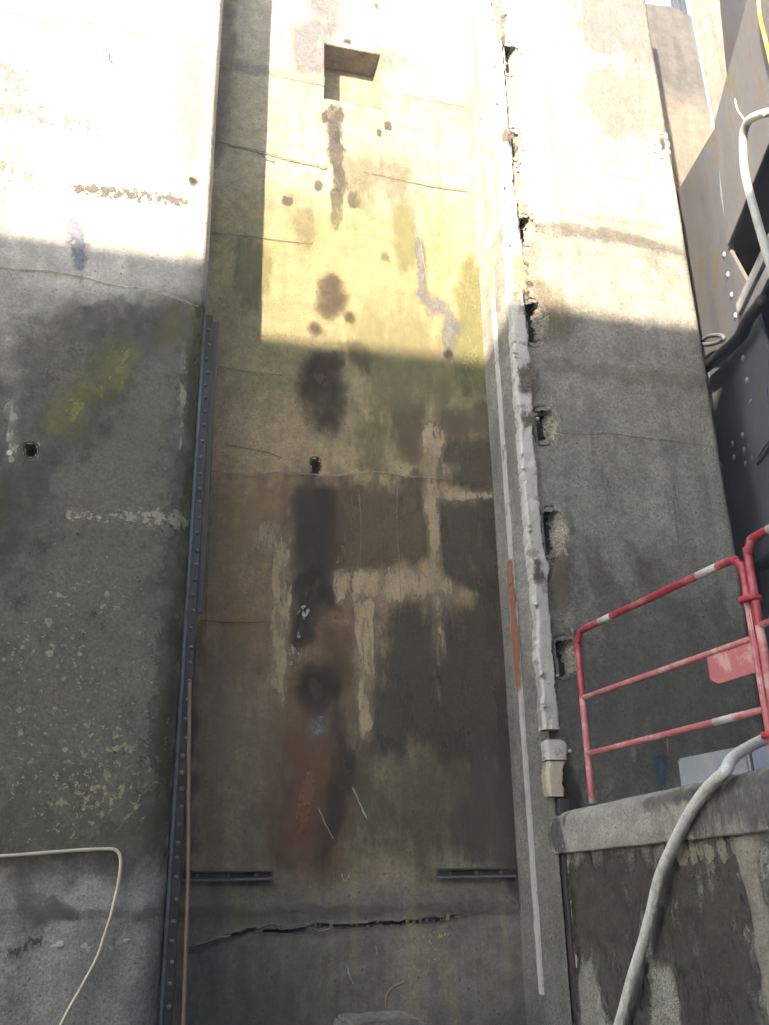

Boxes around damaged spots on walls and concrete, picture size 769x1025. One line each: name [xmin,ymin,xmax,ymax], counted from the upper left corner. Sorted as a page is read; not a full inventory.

spalling [493,40,523,78]
damp [314,104,361,230]
spalling [517,210,538,247]
crack [0,266,198,307]
spalling [524,297,549,348]
spalling [532,404,561,447]
spalling [527,505,570,560]
damp [0,298,204,865]
damp [212,403,519,892]
damp [654,804,736,866]
crack [188,911,468,949]
damp [630,957,651,1025]